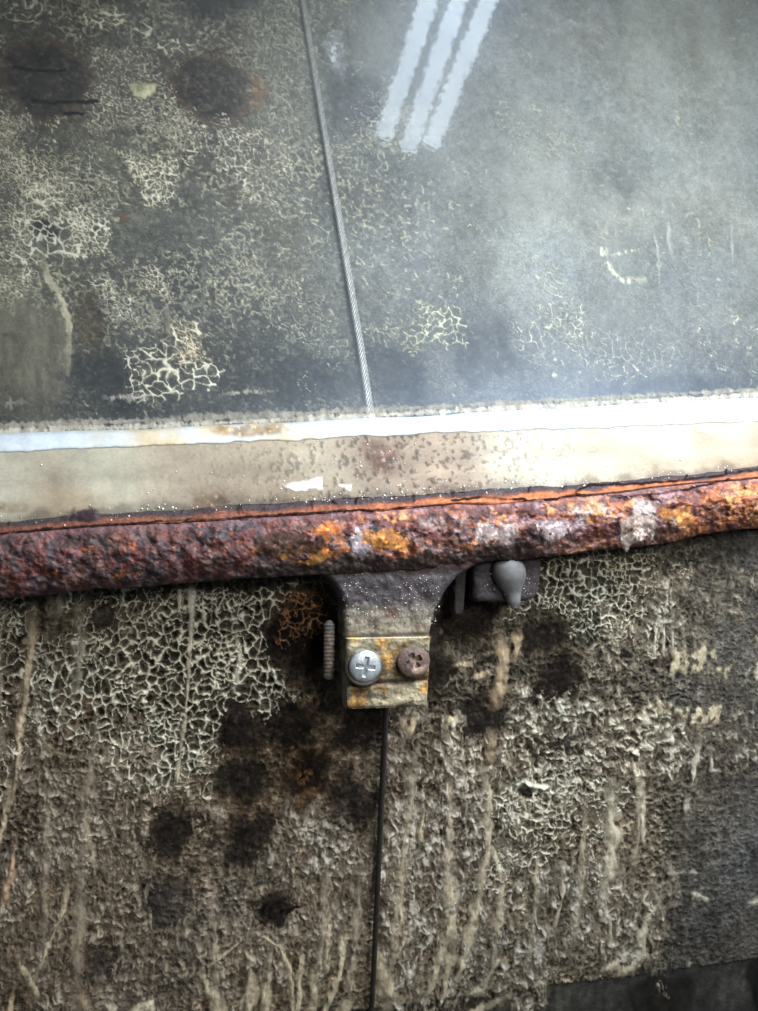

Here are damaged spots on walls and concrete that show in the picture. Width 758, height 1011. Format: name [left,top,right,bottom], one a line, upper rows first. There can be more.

rust [0,466,758,599]
water stain [456,634,522,698]
water stain [0,626,36,842]
water stain [17,782,97,996]
water stain [200,887,364,1011]
water stain [375,788,425,1000]
water stain [429,785,480,994]
water stain [478,784,507,961]
water stain [598,800,621,891]
water stain [631,763,646,858]
water stain [632,975,695,1011]
water stain [691,748,717,780]